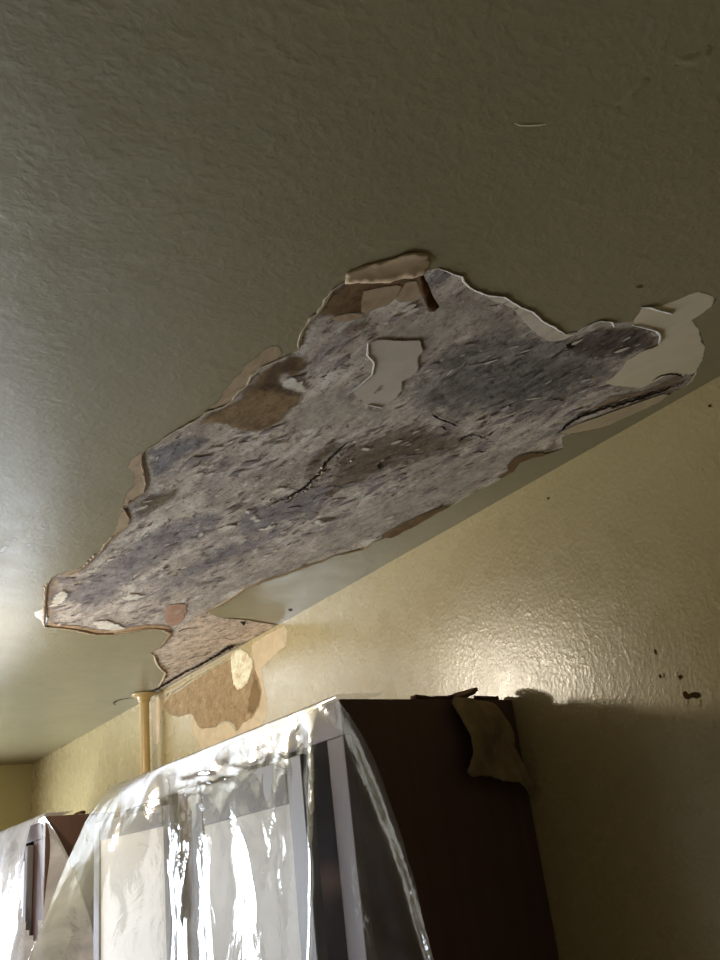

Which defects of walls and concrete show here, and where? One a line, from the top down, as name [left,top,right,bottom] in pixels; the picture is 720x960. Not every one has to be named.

water stain [319,278,412,336]
water stain [201,357,304,432]
water stain [409,325,652,418]
crack [559,373,685,433]
water stain [136,491,175,516]
crack [265,440,356,508]
spalling [34,252,716,754]
water stain [306,426,468,497]
water stain [382,507,448,539]
water stain [498,453,545,478]